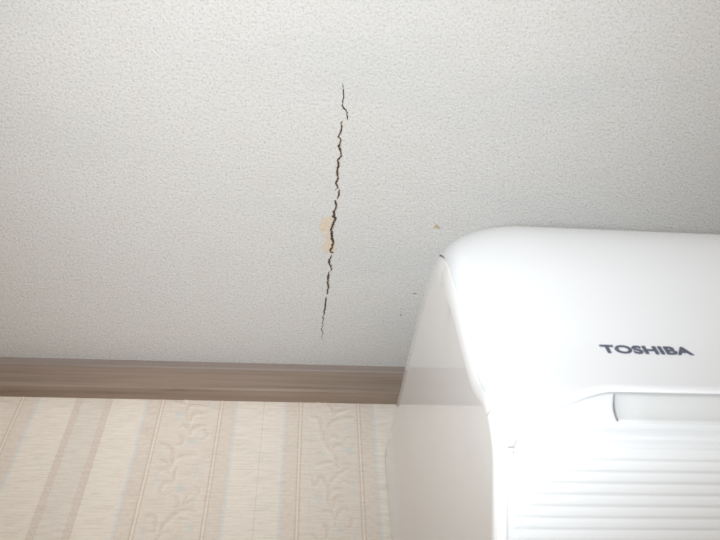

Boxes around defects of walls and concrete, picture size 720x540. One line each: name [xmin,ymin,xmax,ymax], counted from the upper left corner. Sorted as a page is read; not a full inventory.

crack [321,83,348,335]